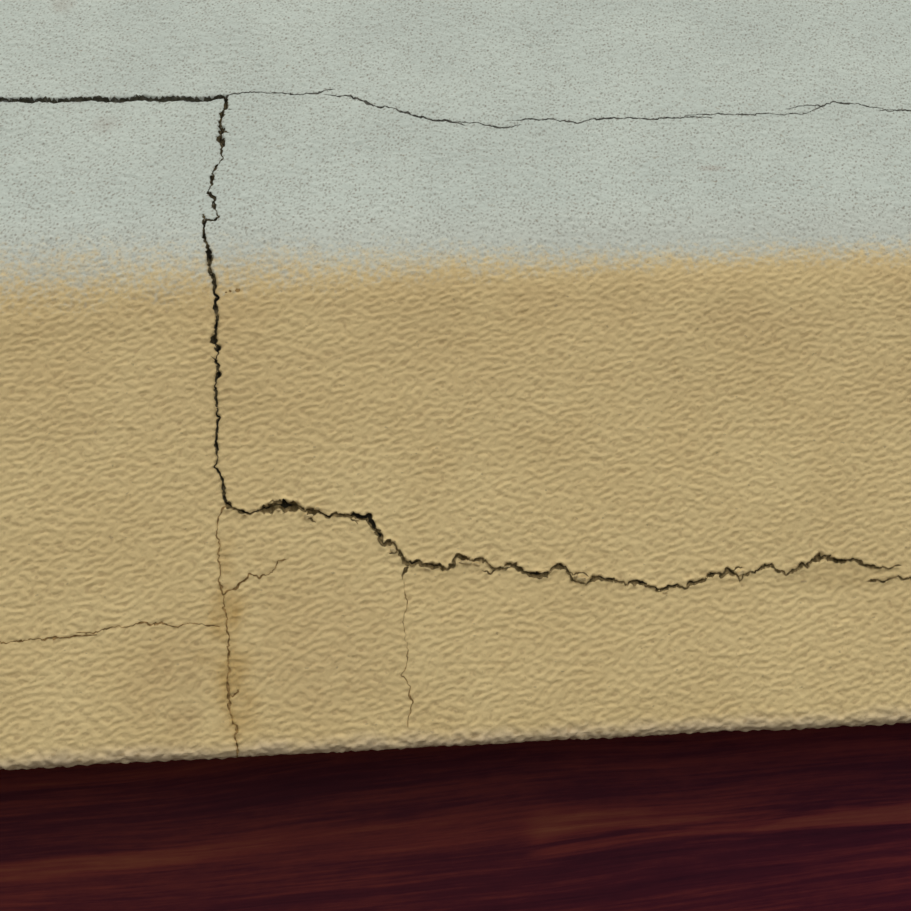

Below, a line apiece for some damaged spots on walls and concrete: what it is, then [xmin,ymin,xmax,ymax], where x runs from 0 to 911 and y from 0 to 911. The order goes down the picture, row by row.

crack [0,89,911,757]